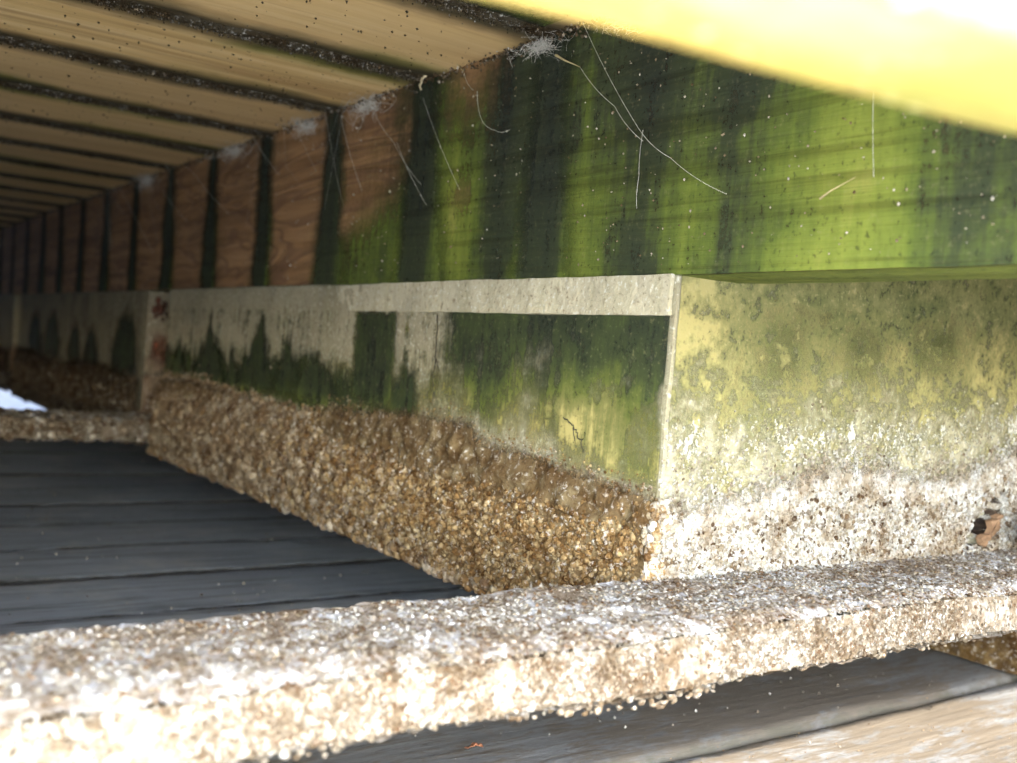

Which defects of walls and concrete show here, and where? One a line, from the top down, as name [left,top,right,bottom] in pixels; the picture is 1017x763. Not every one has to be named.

water stain [392,77,444,282]
water stain [509,31,573,278]
water stain [171,311,417,416]
water stain [758,309,808,387]
water stain [667,411,733,468]
water stain [742,402,1017,464]